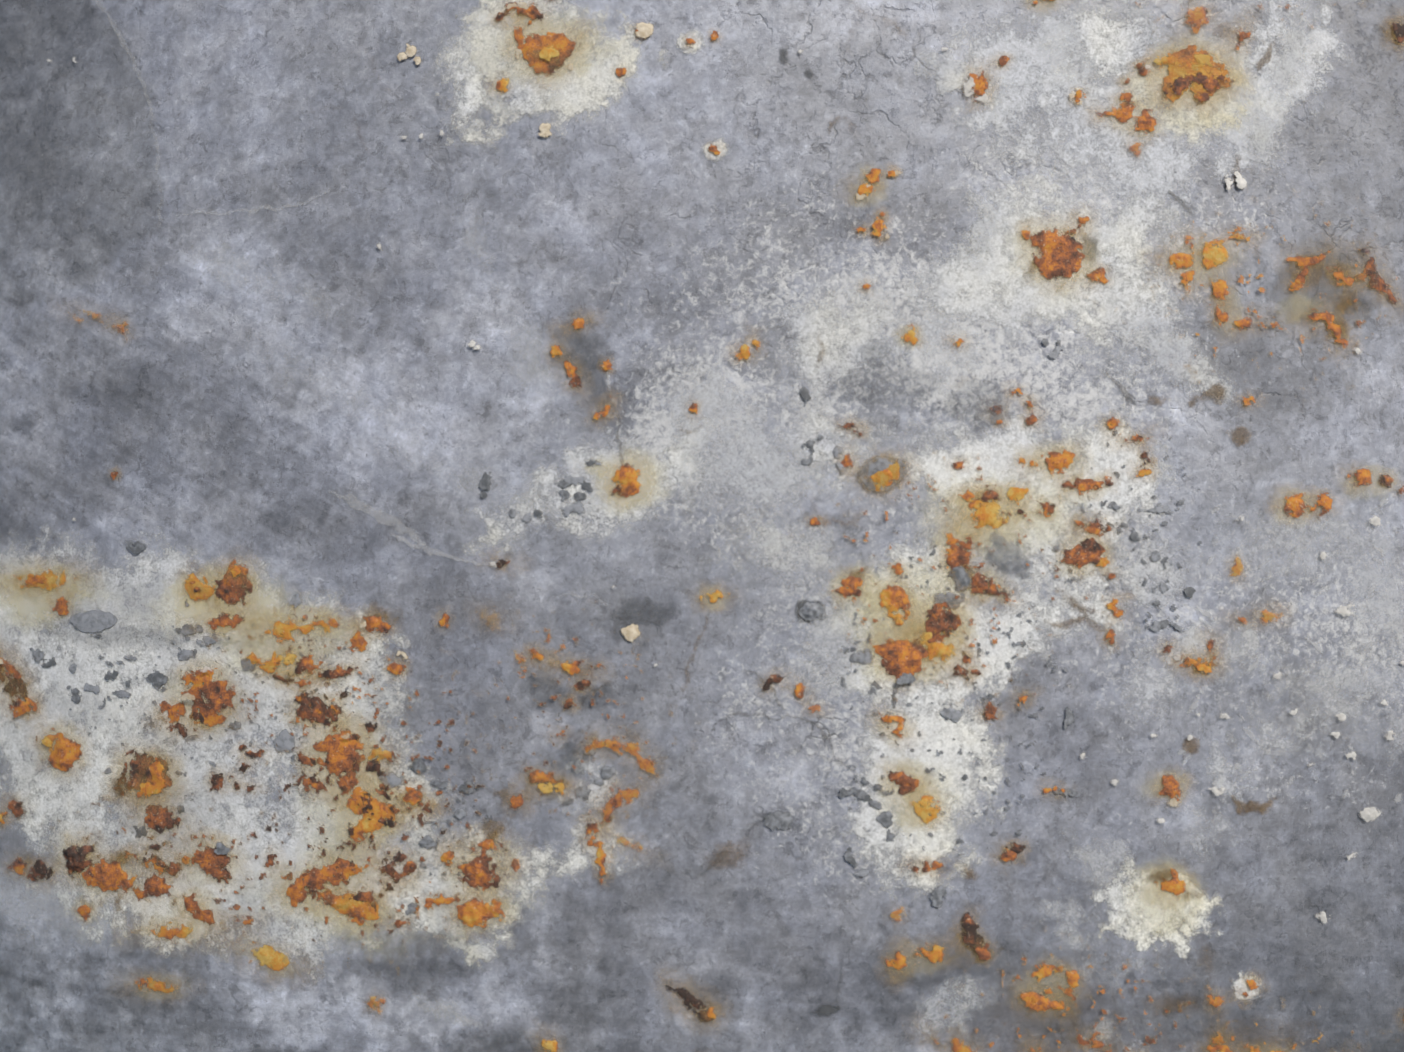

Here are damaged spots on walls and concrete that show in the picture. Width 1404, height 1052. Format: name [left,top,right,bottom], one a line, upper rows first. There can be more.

rust [495,1,581,77]
rust [1069,6,1234,156]
rust [1021,216,1109,284]
rust [1019,449,1114,495]
rust [944,485,1055,602]
rust [1064,518,1116,580]
rust [184,559,253,630]
rust [873,563,981,684]
rust [113,749,181,834]
rust [246,612,434,926]
rust [8,834,232,943]
rust [424,839,521,928]